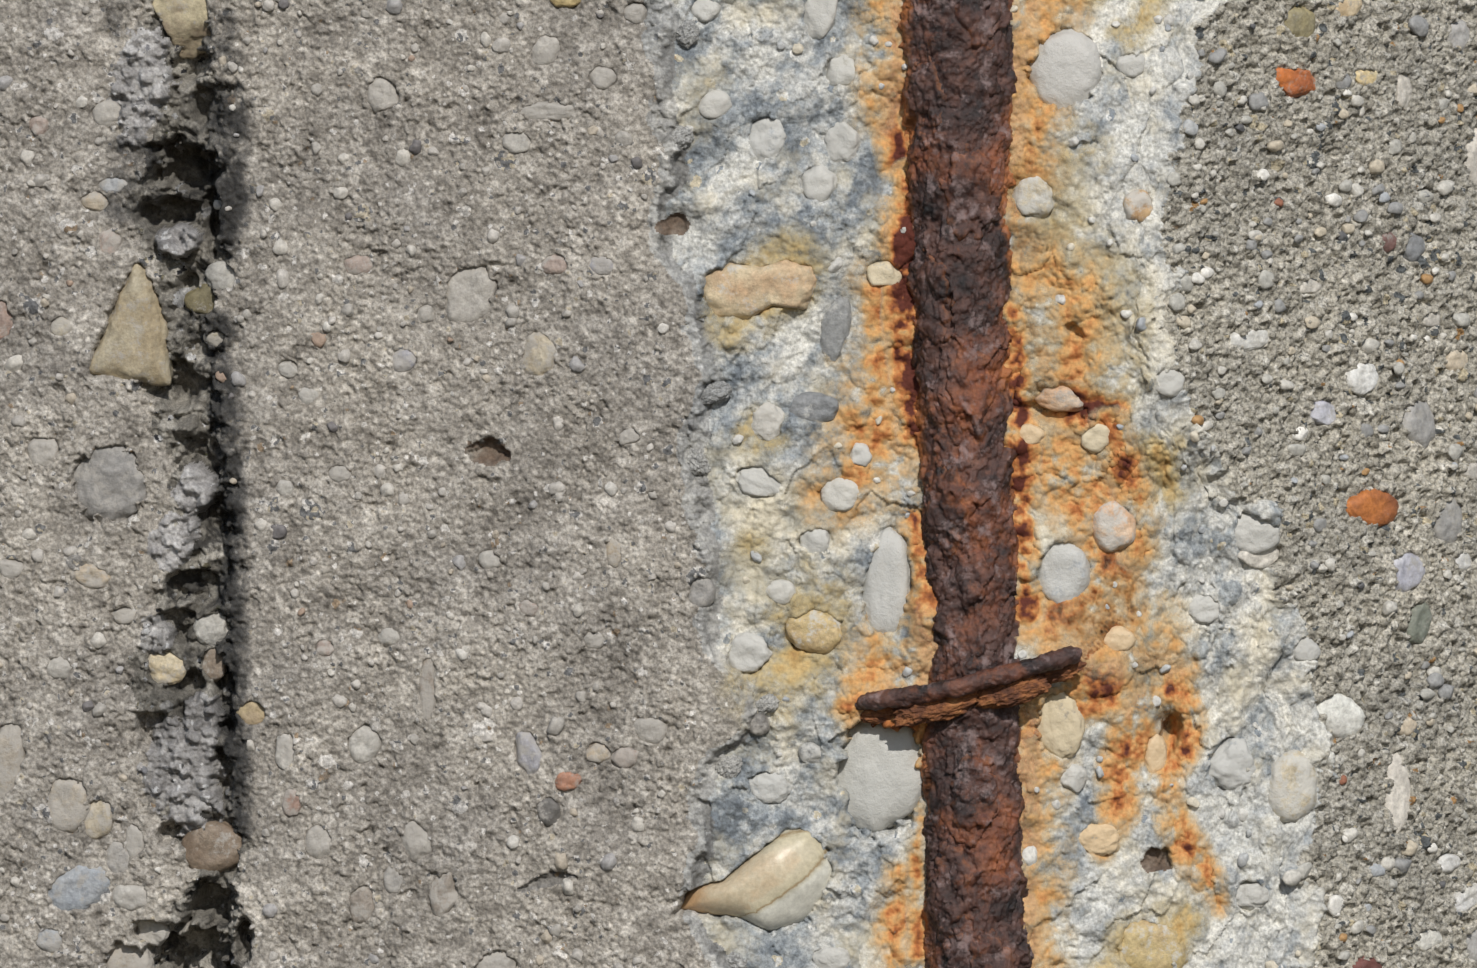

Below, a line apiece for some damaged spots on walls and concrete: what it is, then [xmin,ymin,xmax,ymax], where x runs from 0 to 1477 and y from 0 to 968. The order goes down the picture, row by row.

crack [105,0,254,968]
spalling [641,0,1339,968]
rust [796,0,1229,968]